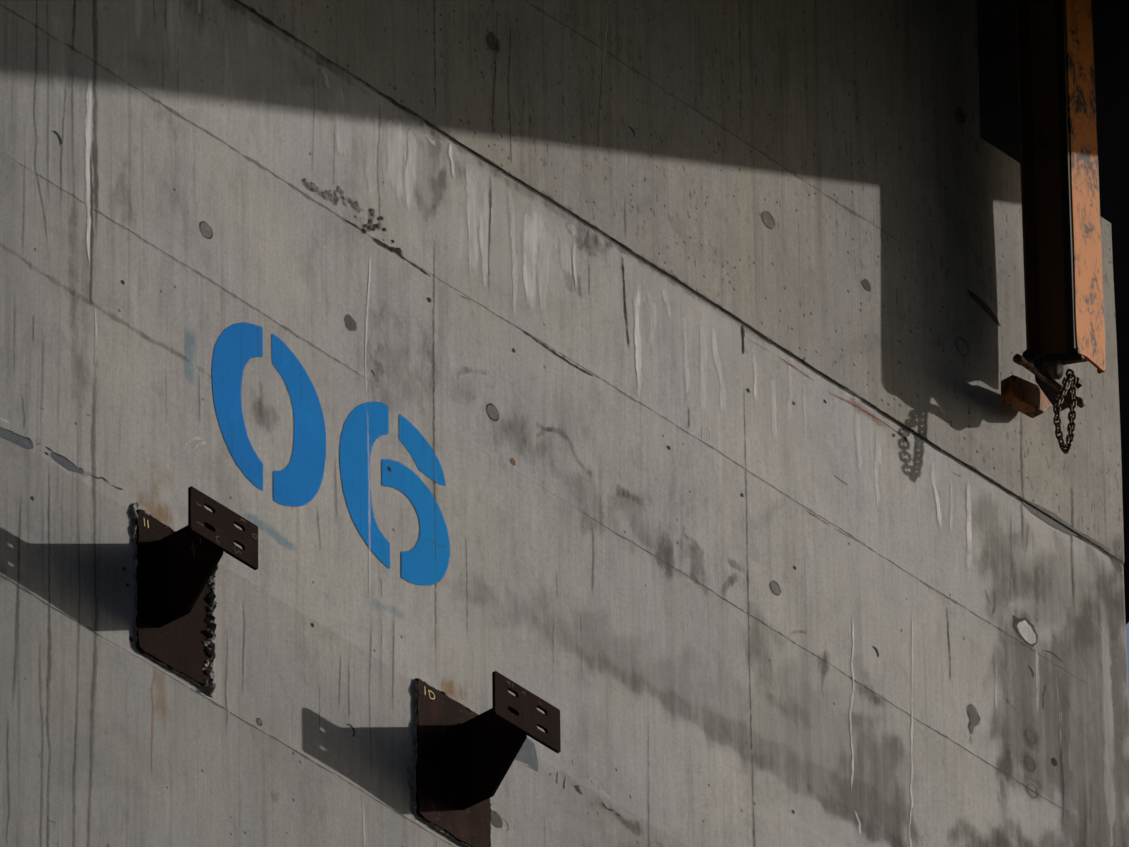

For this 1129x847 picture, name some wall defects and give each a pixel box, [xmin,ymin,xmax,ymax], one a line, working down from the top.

damp [85,80,99,363]
spalling [363,209,402,255]
damp [376,121,415,208]
damp [448,143,492,284]
efflorescence [509,203,548,308]
damp [931,469,951,527]
spalling [1013,615,1038,647]
damp [995,584,1129,847]